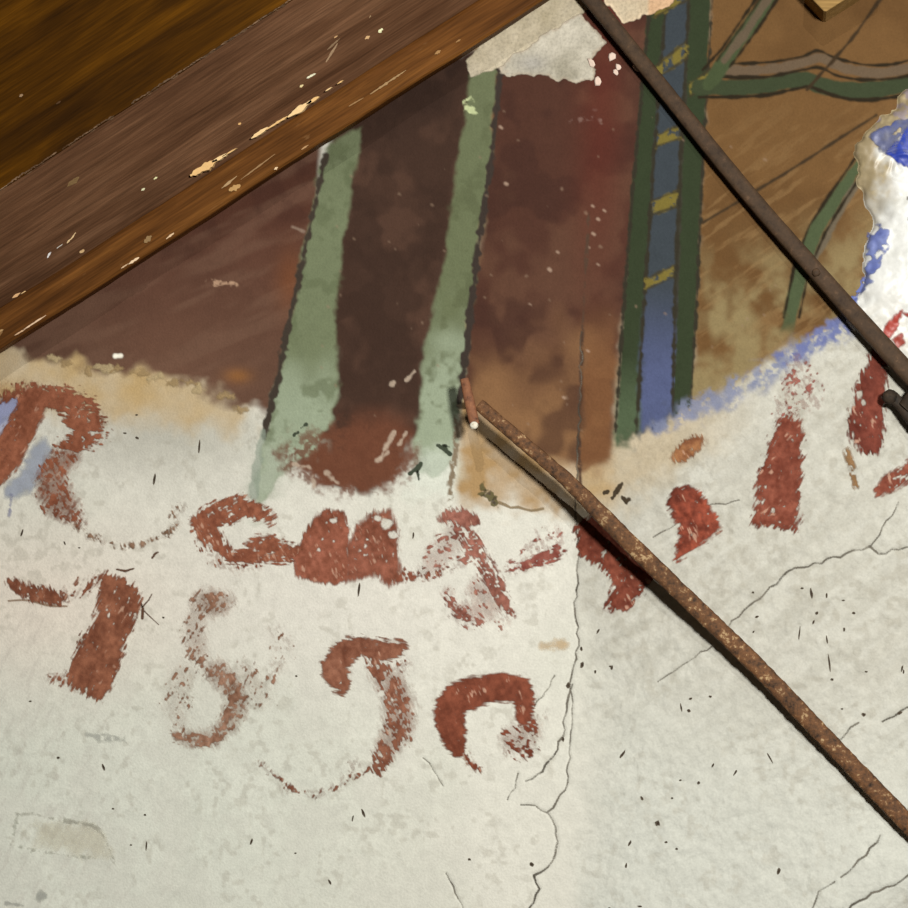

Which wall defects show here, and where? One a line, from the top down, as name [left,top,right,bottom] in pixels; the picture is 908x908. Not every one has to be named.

peeling [85,364,202,394]
crack [730,508,907,624]
crack [507,504,580,908]
crack [833,839,879,883]
crack [849,875,908,908]